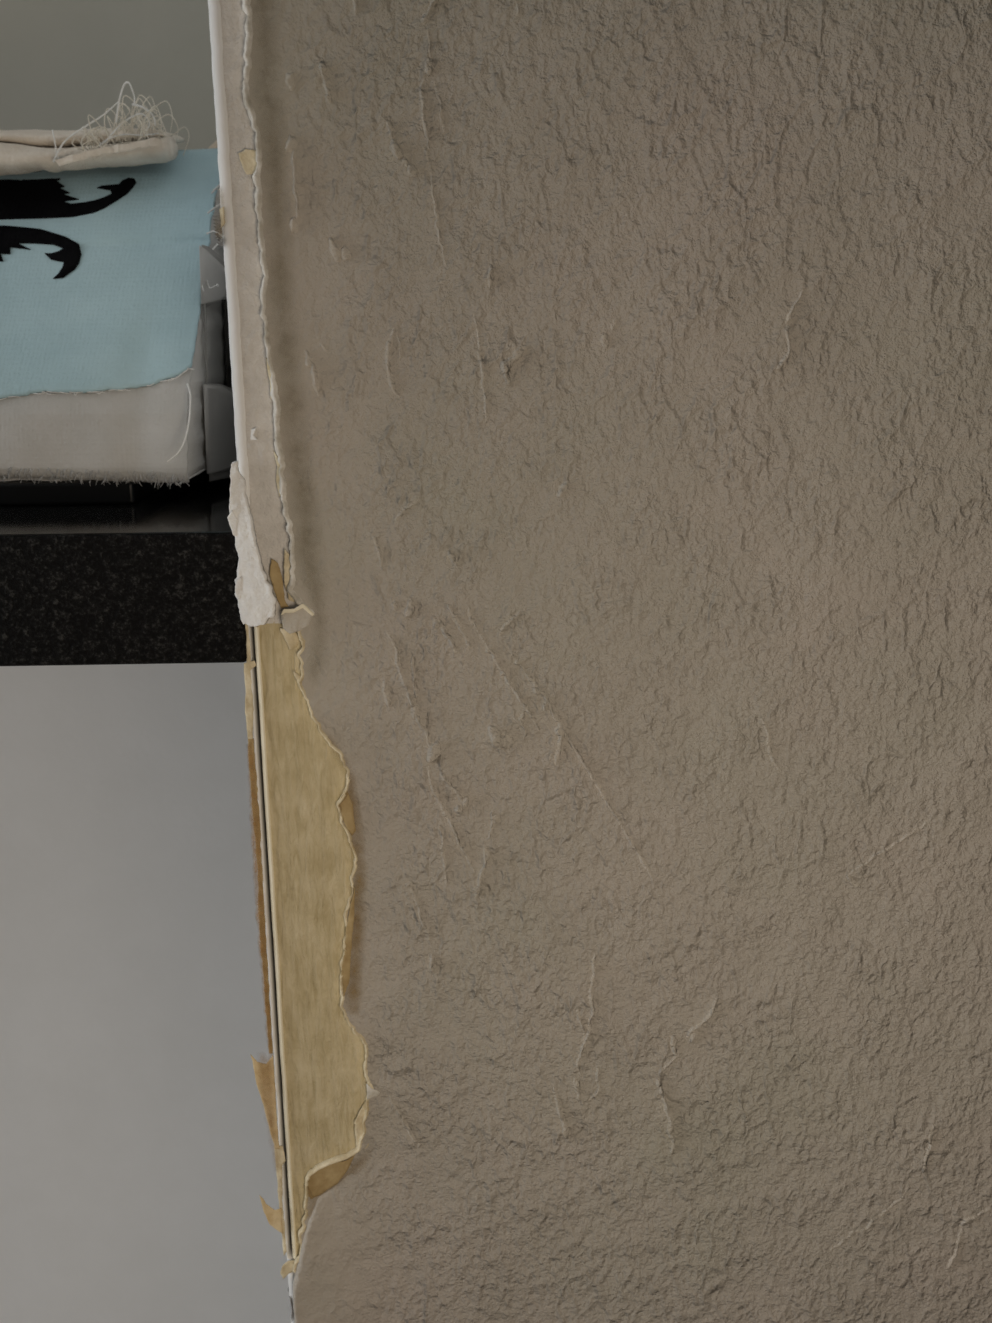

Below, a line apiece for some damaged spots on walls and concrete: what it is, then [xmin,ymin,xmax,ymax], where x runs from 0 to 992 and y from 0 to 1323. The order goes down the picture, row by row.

peeling [217,0,380,1279]